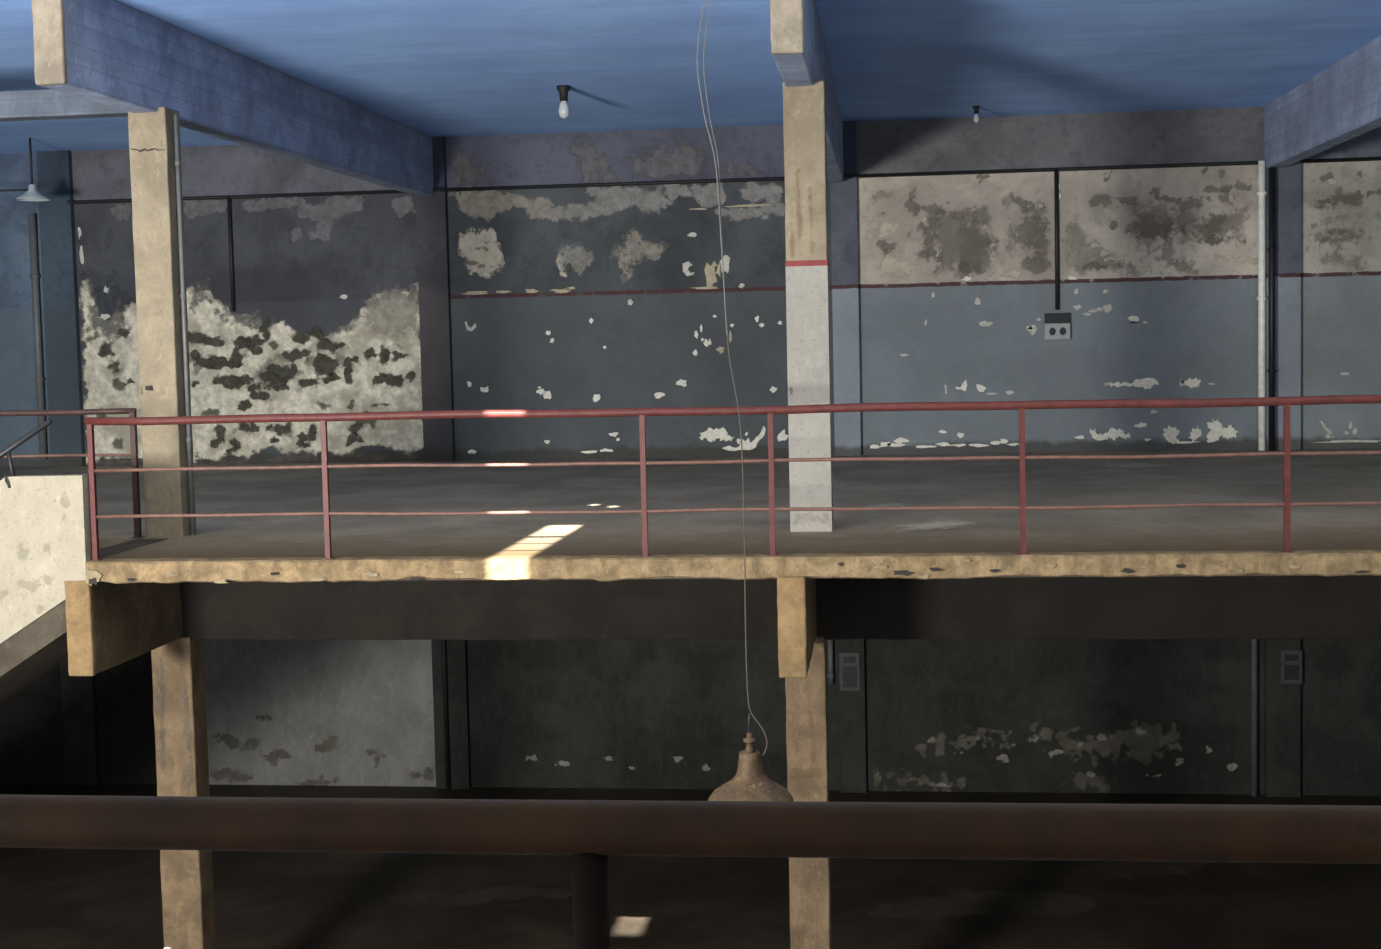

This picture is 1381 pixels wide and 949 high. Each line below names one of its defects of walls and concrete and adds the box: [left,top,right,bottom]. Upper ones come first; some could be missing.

peeling [448,133,785,222]
peeling [184,194,365,243]
water stain [1311,171,1381,267]
peeling [683,255,730,289]
peeling [78,227,153,465]
peeling [693,314,734,356]
peeling [186,277,424,464]
peeling [654,379,687,399]
peeling [581,432,620,453]
peeling [699,426,789,451]
peeling [870,430,1019,449]
peeling [1075,410,1238,444]